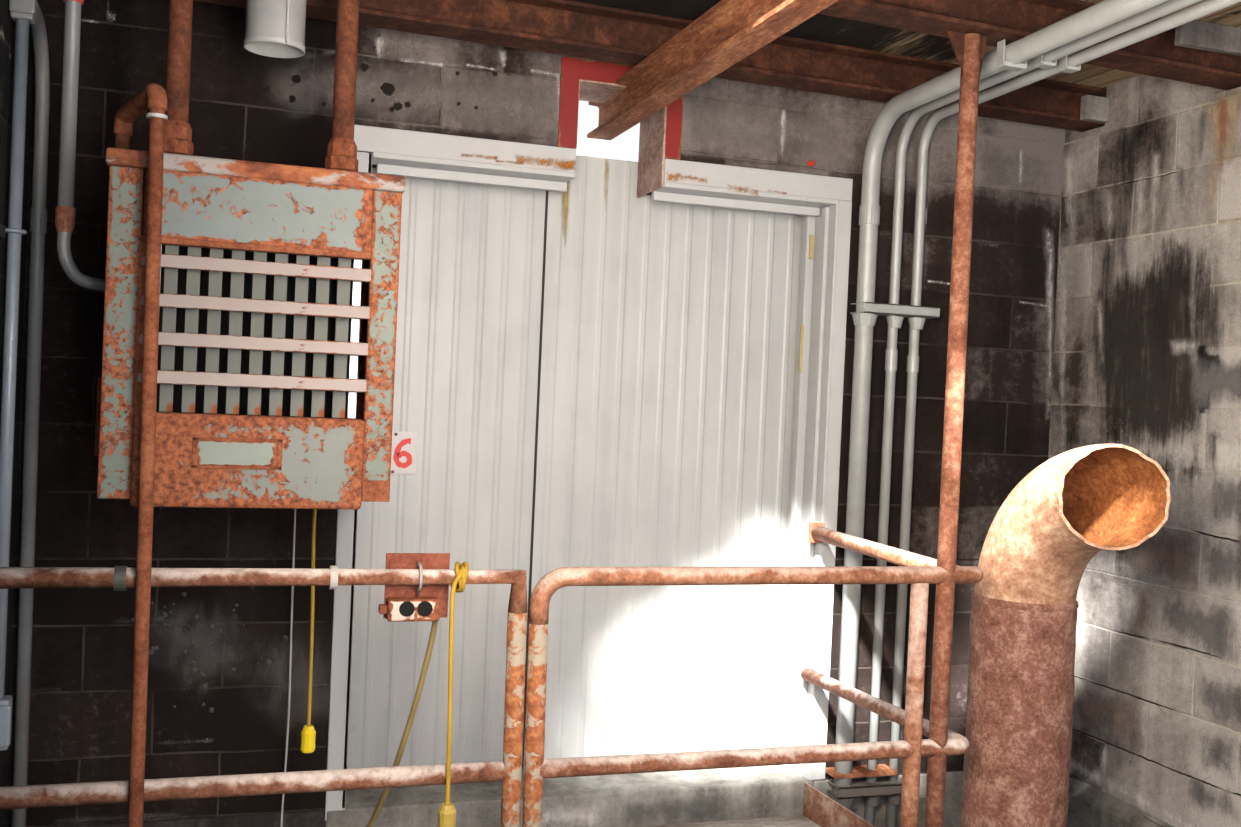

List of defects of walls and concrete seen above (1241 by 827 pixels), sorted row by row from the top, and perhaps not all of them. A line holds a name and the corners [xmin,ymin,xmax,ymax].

corrosion [462,154,575,169]
water stain [1066,157,1074,224]
water stain [1087,129,1161,290]
water stain [1188,362,1241,406]